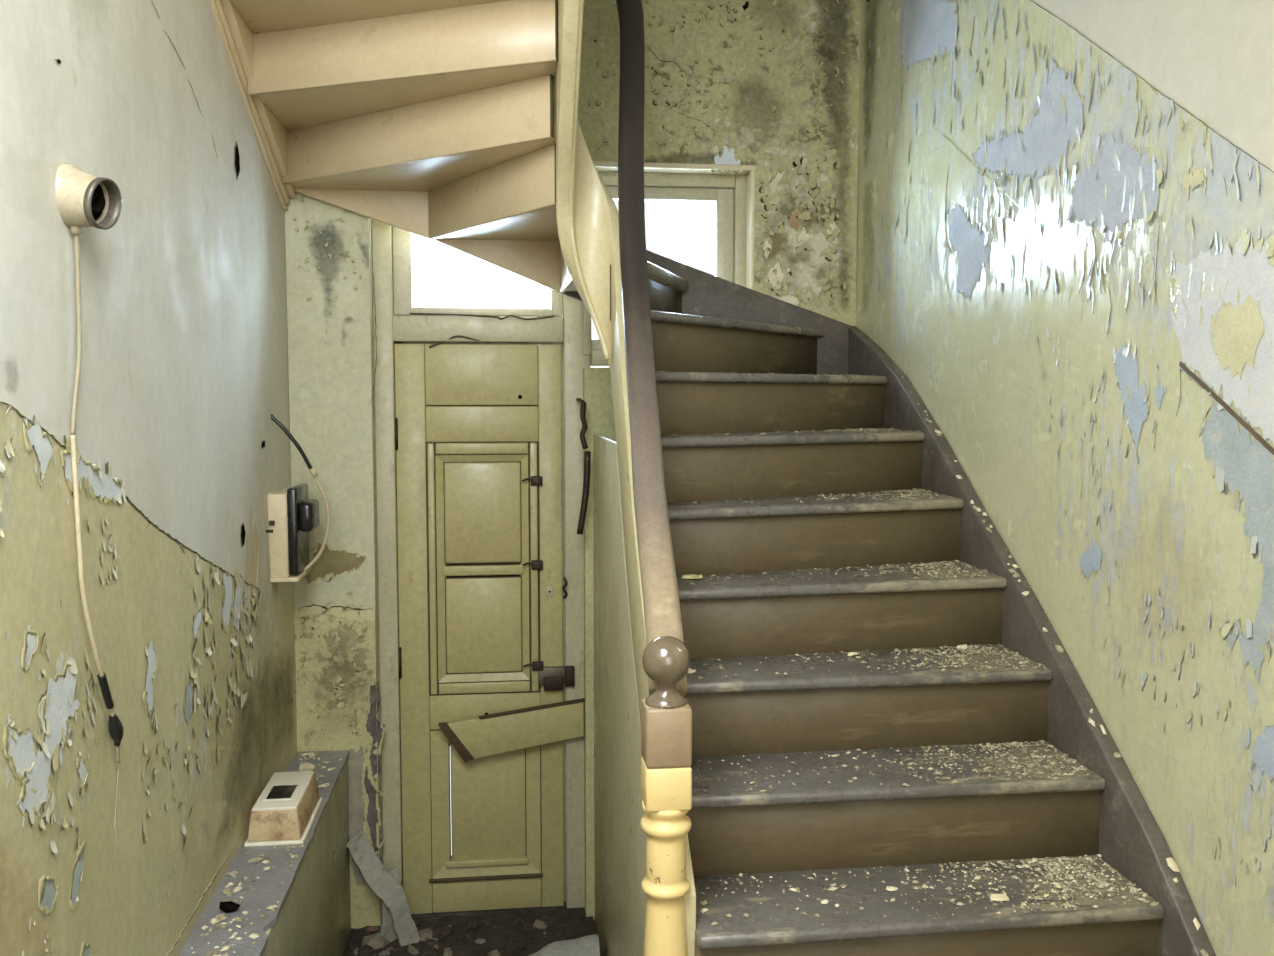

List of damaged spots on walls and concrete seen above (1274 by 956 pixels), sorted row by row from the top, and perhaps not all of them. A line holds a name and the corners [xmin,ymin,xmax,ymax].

water stain [313,227,342,290]
peeling [711,145,744,174]
peeling [865,0,1184,314]
peeling [0,415,127,586]
spalling [303,543,368,583]
peeling [1047,340,1166,617]
peeling [1125,218,1274,684]
peeling [0,618,98,933]
peeling [142,554,262,873]
peeling [297,617,385,887]
peeling [1141,672,1231,728]
peeling [1233,723,1274,886]